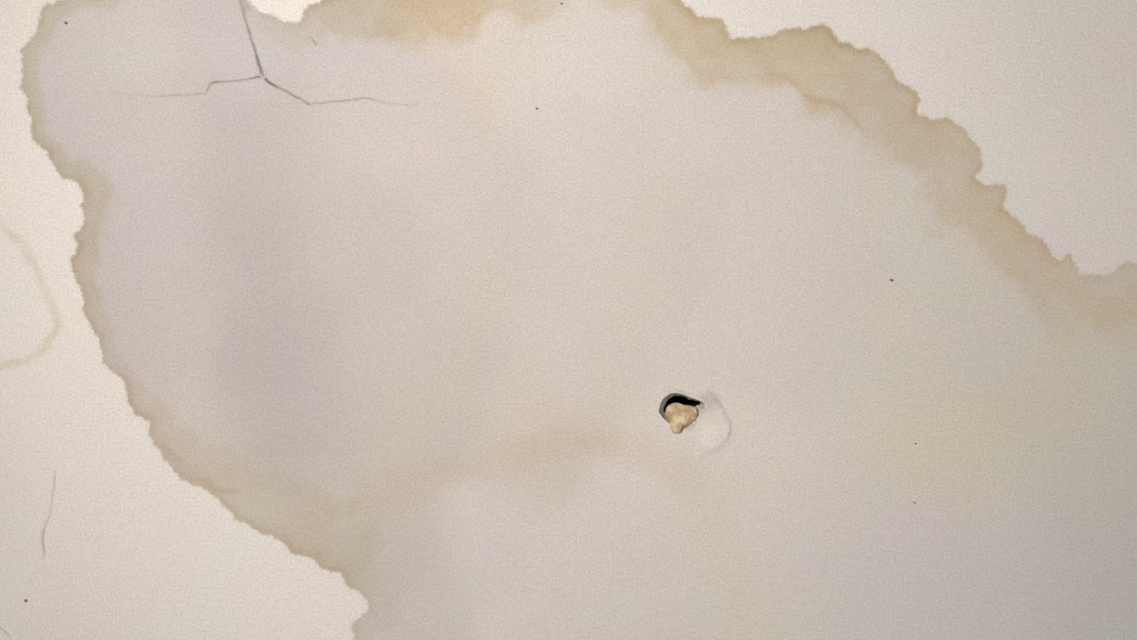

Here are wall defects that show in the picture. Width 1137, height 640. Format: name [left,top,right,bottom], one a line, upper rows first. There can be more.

damp [12,0,148,356]
crack [108,0,422,109]
damp [243,0,389,56]
damp [377,0,509,155]
damp [436,0,1137,336]
damp [0,211,68,375]
damp [222,124,332,518]
damp [96,352,715,640]
spalling [652,379,739,461]
damp [661,453,790,640]
damp [848,292,1105,501]
damp [1100,334,1137,366]